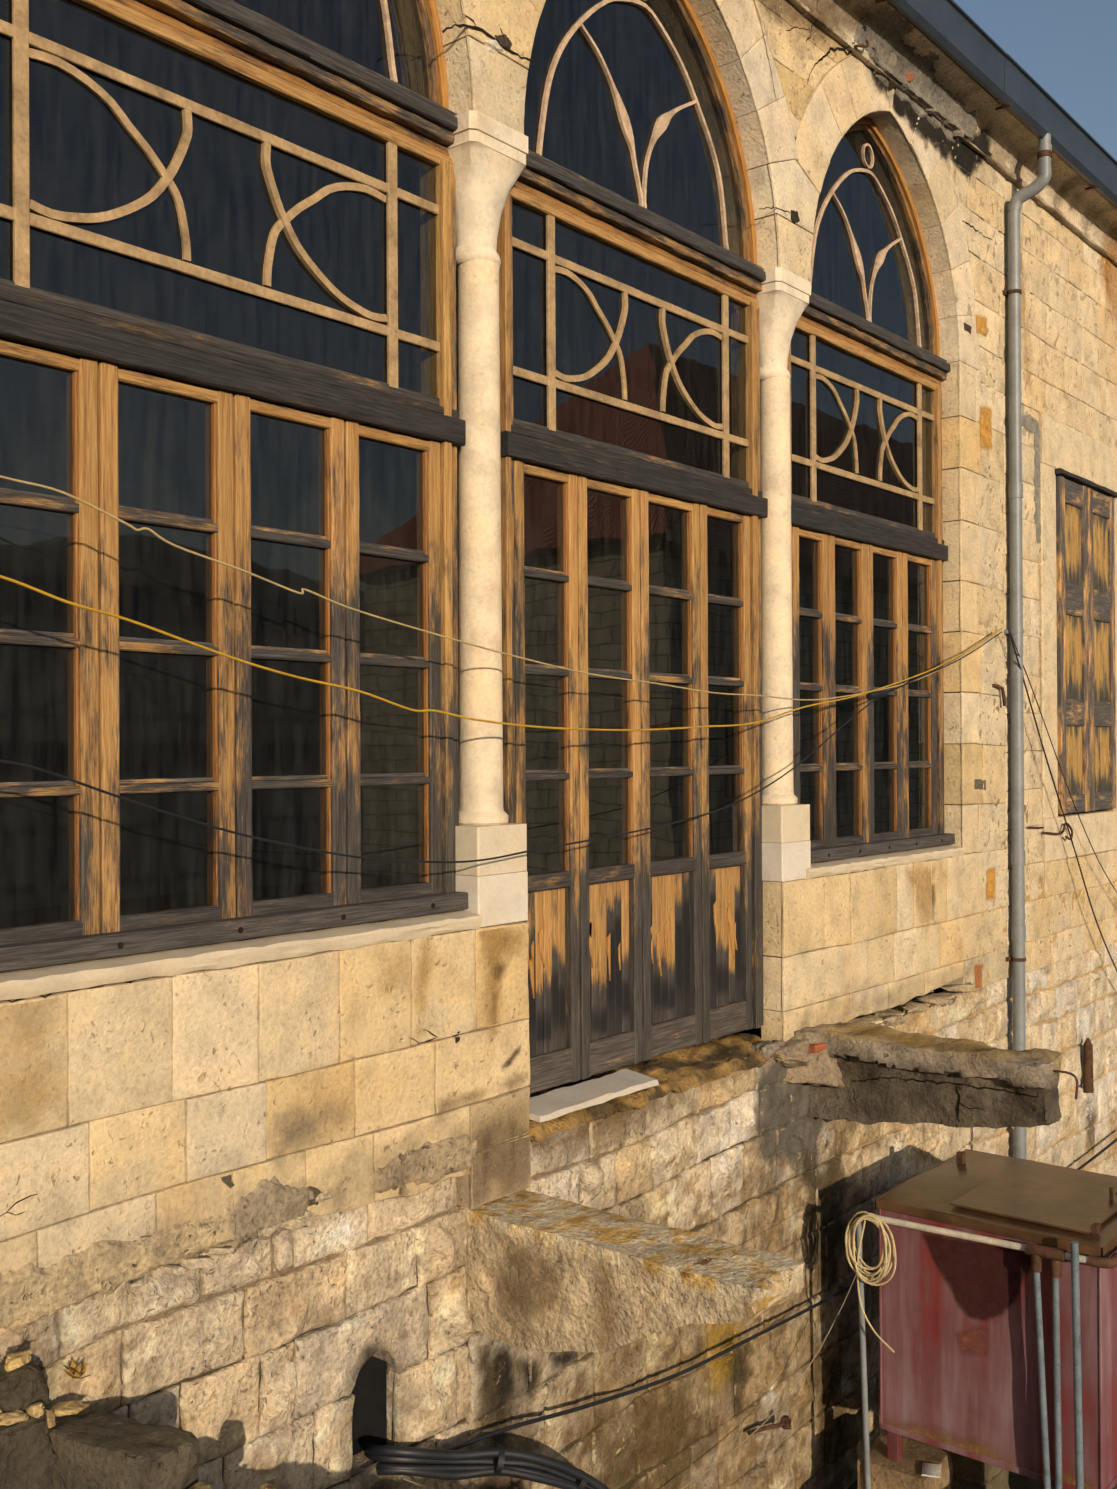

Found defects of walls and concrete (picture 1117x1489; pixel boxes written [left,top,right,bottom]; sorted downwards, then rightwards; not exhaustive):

crack [442,14,541,65]
crack [755,0,855,102]
damp [871,69,992,177]
rust [976,316,987,335]
rust [980,407,992,449]
crack [738,1077,1038,1246]
damp [479,1351,537,1447]
damp [552,1352,576,1366]